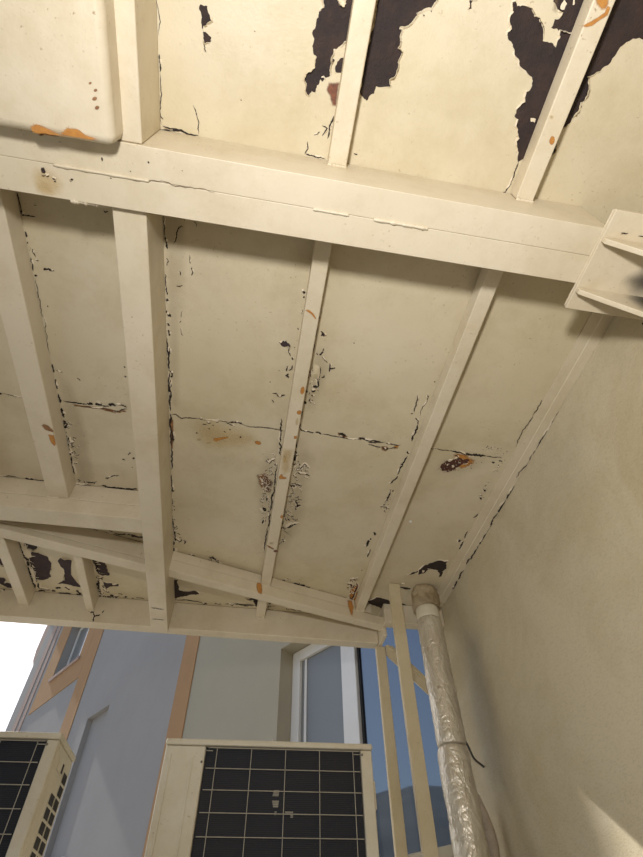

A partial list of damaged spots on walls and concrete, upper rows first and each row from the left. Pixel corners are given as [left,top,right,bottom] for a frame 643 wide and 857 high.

peeling [303,0,352,97]
peeling [360,0,438,100]
peeling [505,0,584,162]
corrosion [584,0,610,27]
peeling [562,0,643,130]
corrosion [31,124,95,140]
crack [17,193,137,490]
crack [163,215,558,589]
peeling [25,543,81,588]
crack [344,532,376,600]
peeling [367,596,390,608]
peeling [400,559,449,591]